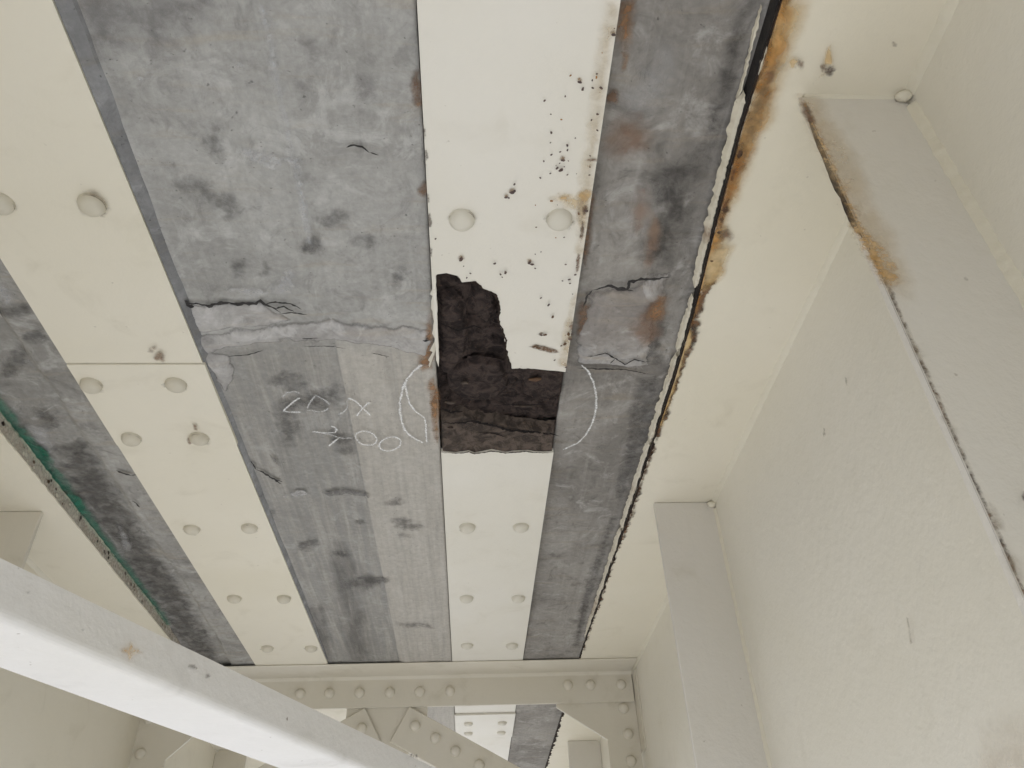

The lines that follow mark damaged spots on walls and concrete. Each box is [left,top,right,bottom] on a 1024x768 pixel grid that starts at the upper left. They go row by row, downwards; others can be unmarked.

rust [570,73,618,103]
rust [725,5,803,199]
crack [184,299,339,348]
spalling [436,273,559,422]
rust [532,305,588,368]
rust [550,191,594,295]
crack [583,277,669,307]
water stain [654,168,691,256]
rust [660,330,691,425]
rust [696,216,730,308]
rust [803,103,898,281]